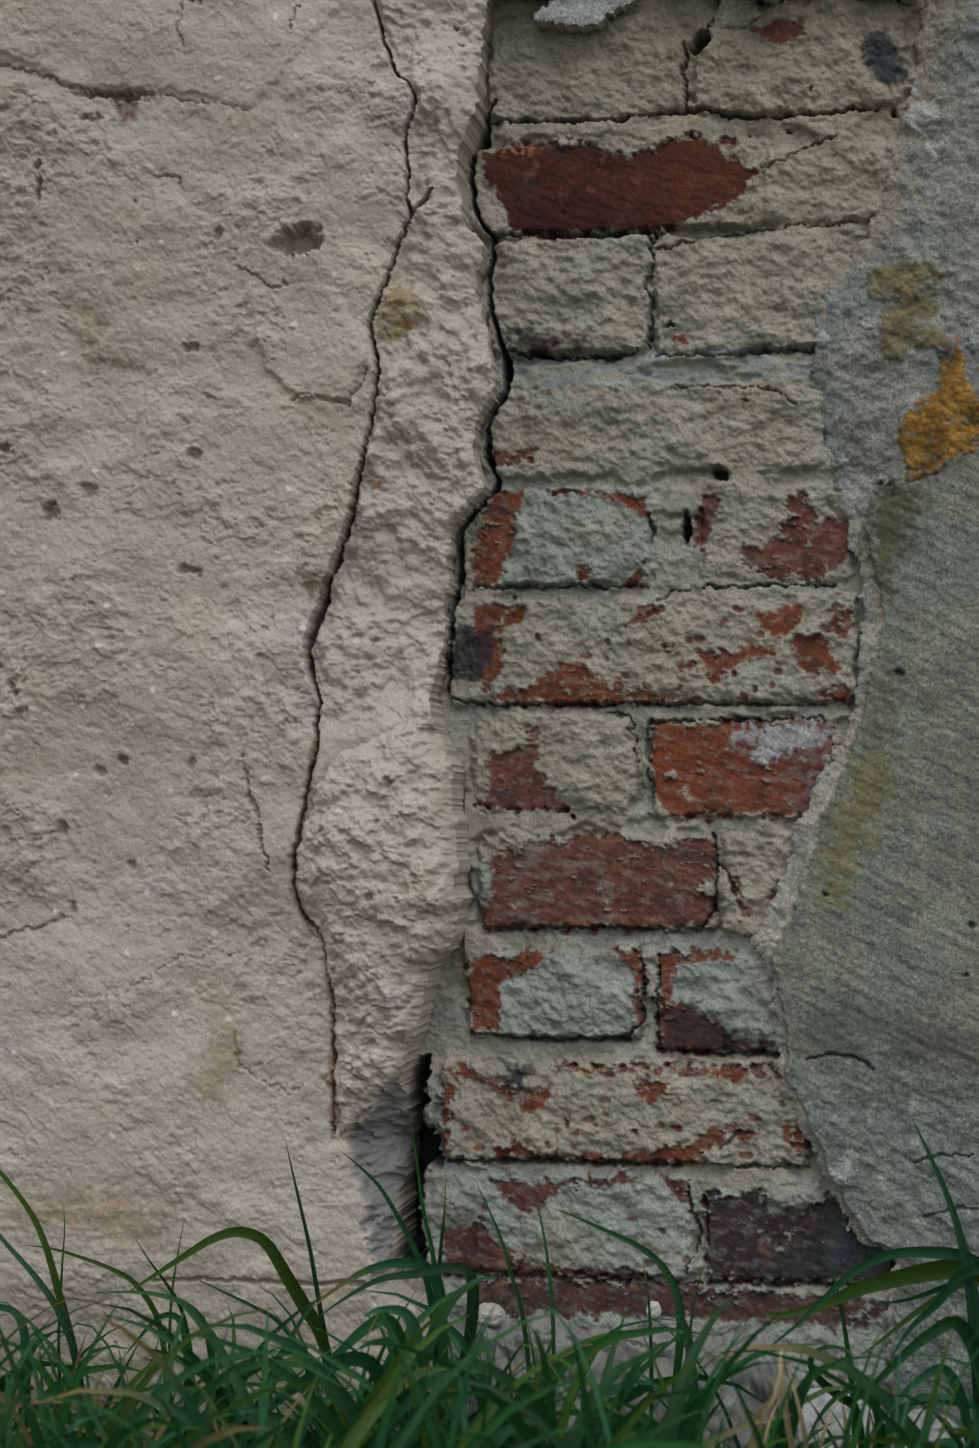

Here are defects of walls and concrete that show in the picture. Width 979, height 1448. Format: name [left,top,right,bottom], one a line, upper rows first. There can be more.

crack [0,62,84,91]
crack [447,98,881,697]
water stain [898,337,979,480]
crack [91,0,434,1139]
spalling [400,0,924,1410]
crack [716,863,740,900]
crack [805,1052,877,1073]